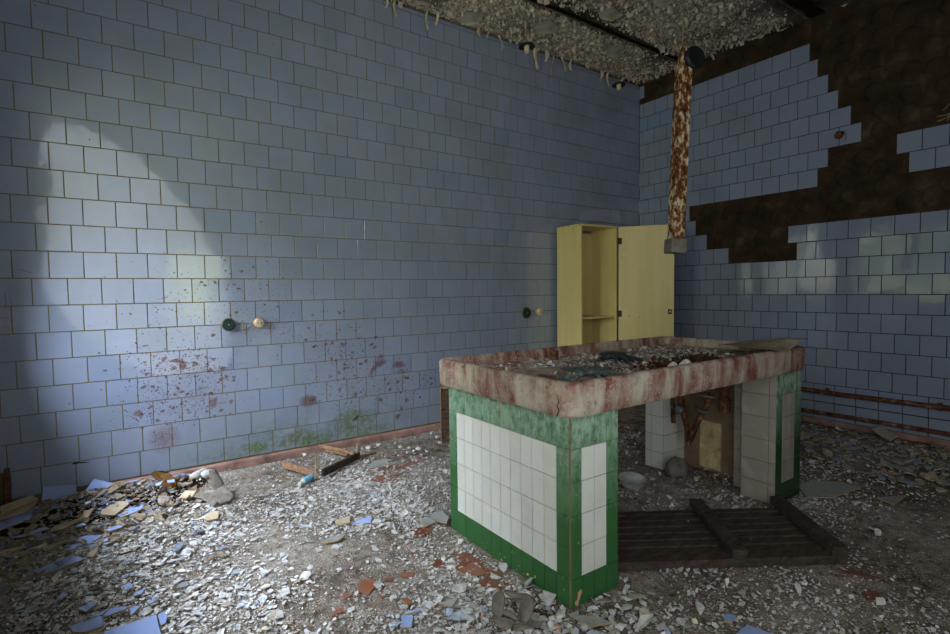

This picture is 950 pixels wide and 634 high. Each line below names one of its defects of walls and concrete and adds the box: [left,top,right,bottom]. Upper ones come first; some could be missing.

peeling [391,0,950,264]